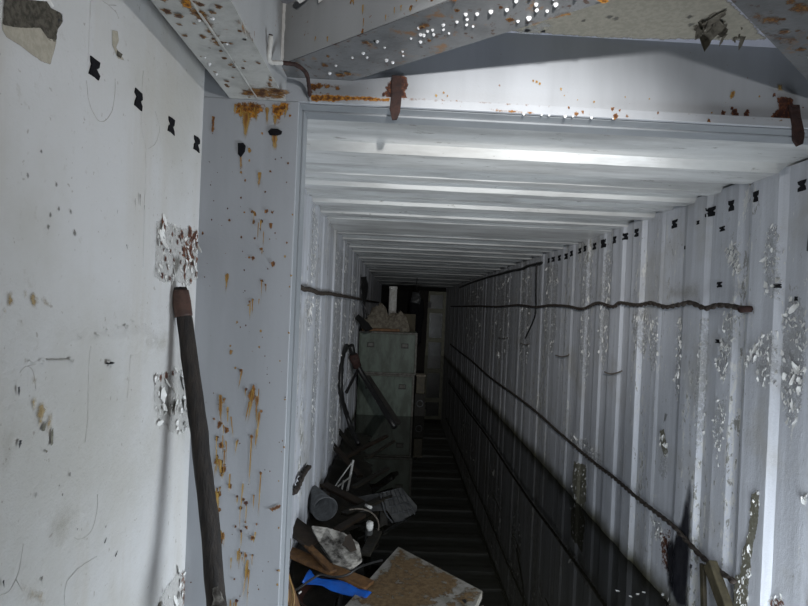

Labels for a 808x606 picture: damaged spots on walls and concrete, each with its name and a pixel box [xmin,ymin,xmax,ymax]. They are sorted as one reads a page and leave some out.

flaking render [2,0,63,64]
rust [160,0,246,88]
rust [311,72,391,102]
rust [402,76,412,99]
rust [771,85,793,121]
peeling [157,213,202,290]
rust [240,197,276,260]
peeling [744,223,808,428]
peeling [154,365,187,435]
rust [213,367,270,606]
peeling [733,490,760,606]
peeling [158,565,186,606]